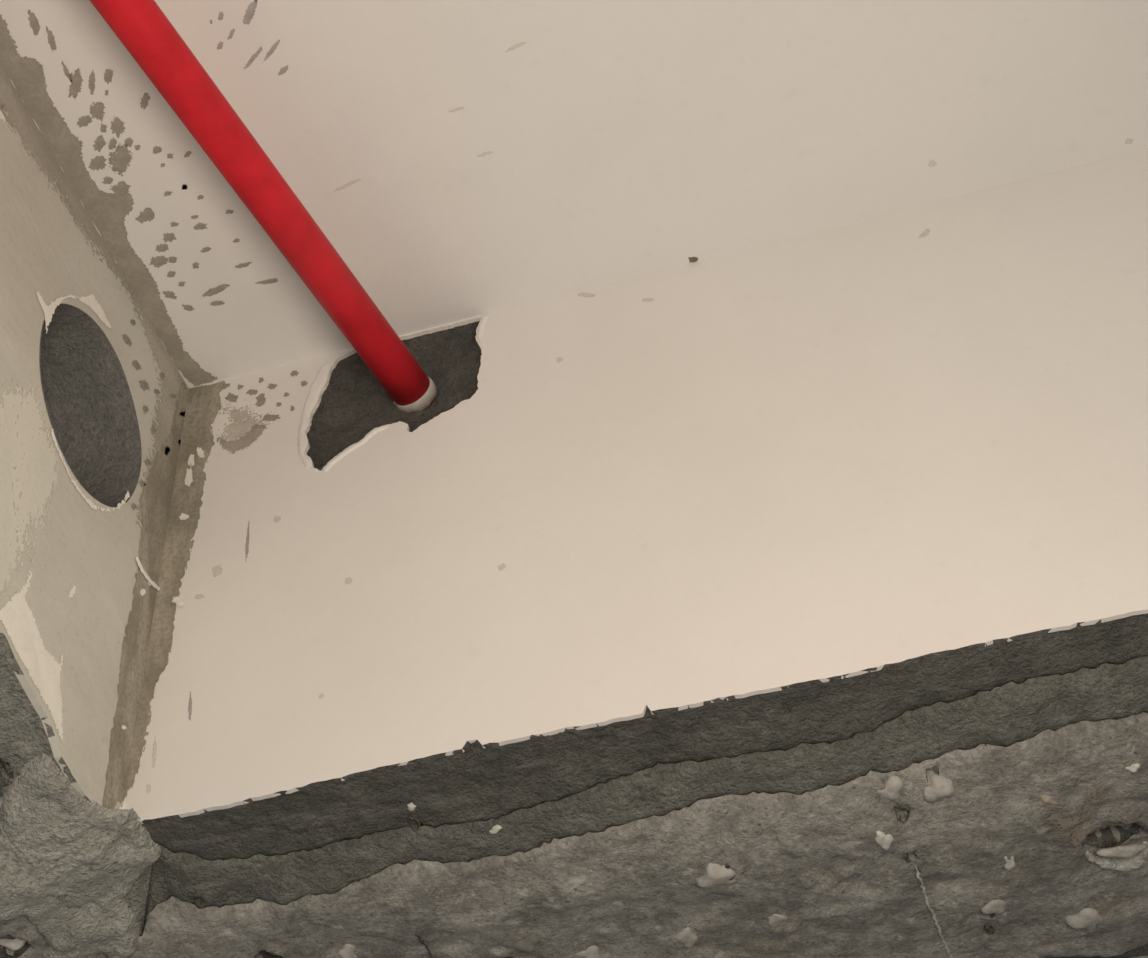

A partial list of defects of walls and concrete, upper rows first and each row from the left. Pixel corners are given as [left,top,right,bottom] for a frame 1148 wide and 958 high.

spalling [36,287,111,333]
spalling [132,360,177,399]
flaking render [297,314,489,472]
peeling [0,370,137,807]
spalling [124,613,1148,958]
spalling [0,915,47,958]